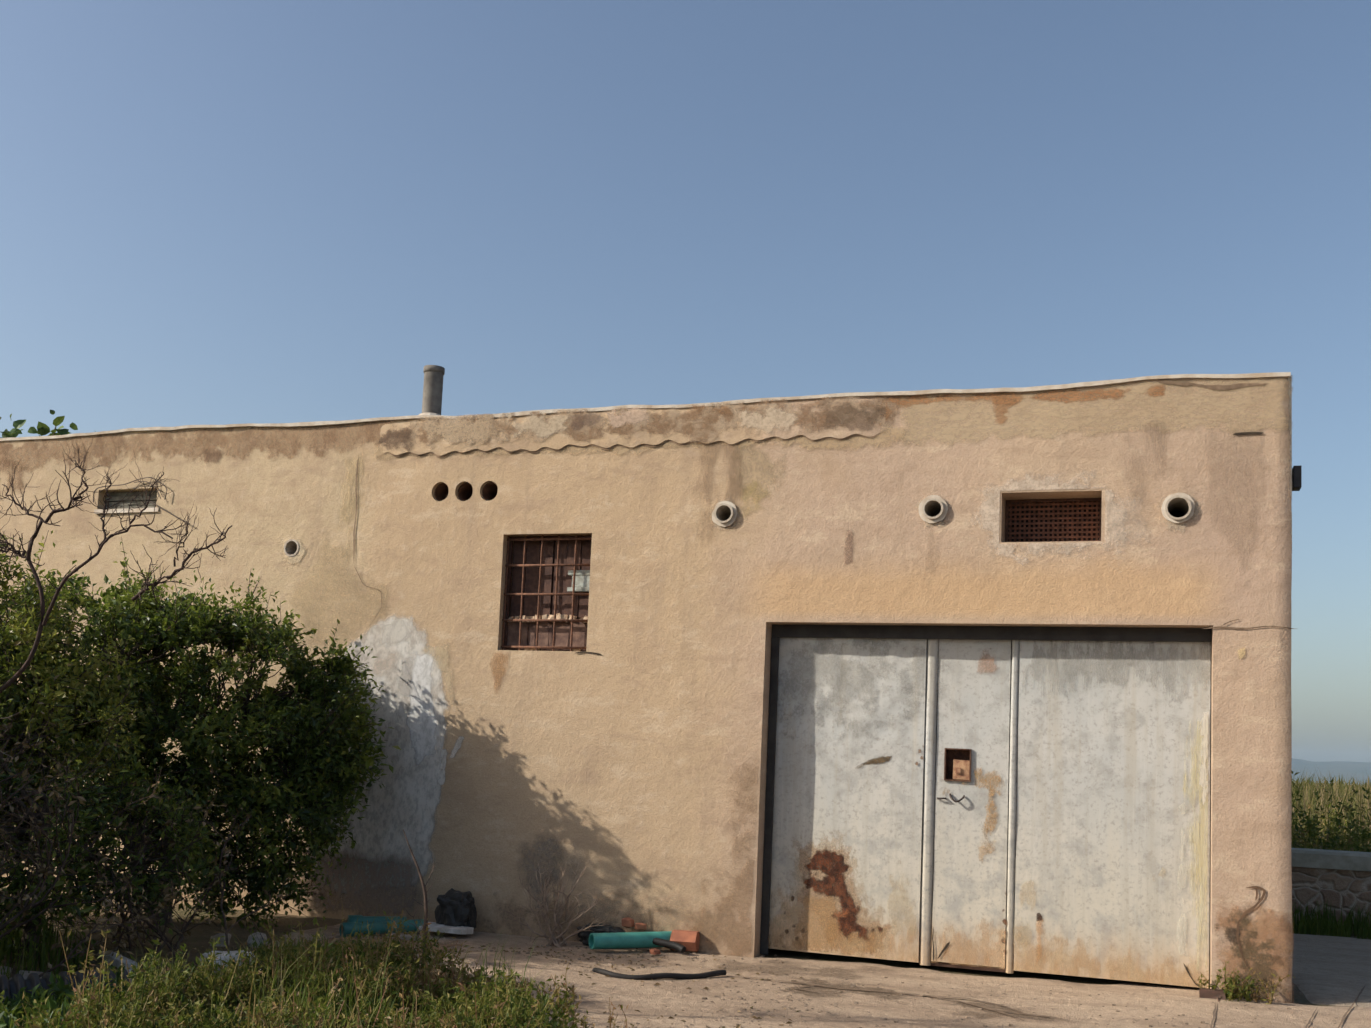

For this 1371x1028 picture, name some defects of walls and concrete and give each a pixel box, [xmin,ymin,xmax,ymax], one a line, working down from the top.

crack [353,432,882,621]
leakage [0,376,1292,532]
flaking render [308,617,464,916]
corrosion [962,769,1001,832]
corrosion [784,850,883,940]